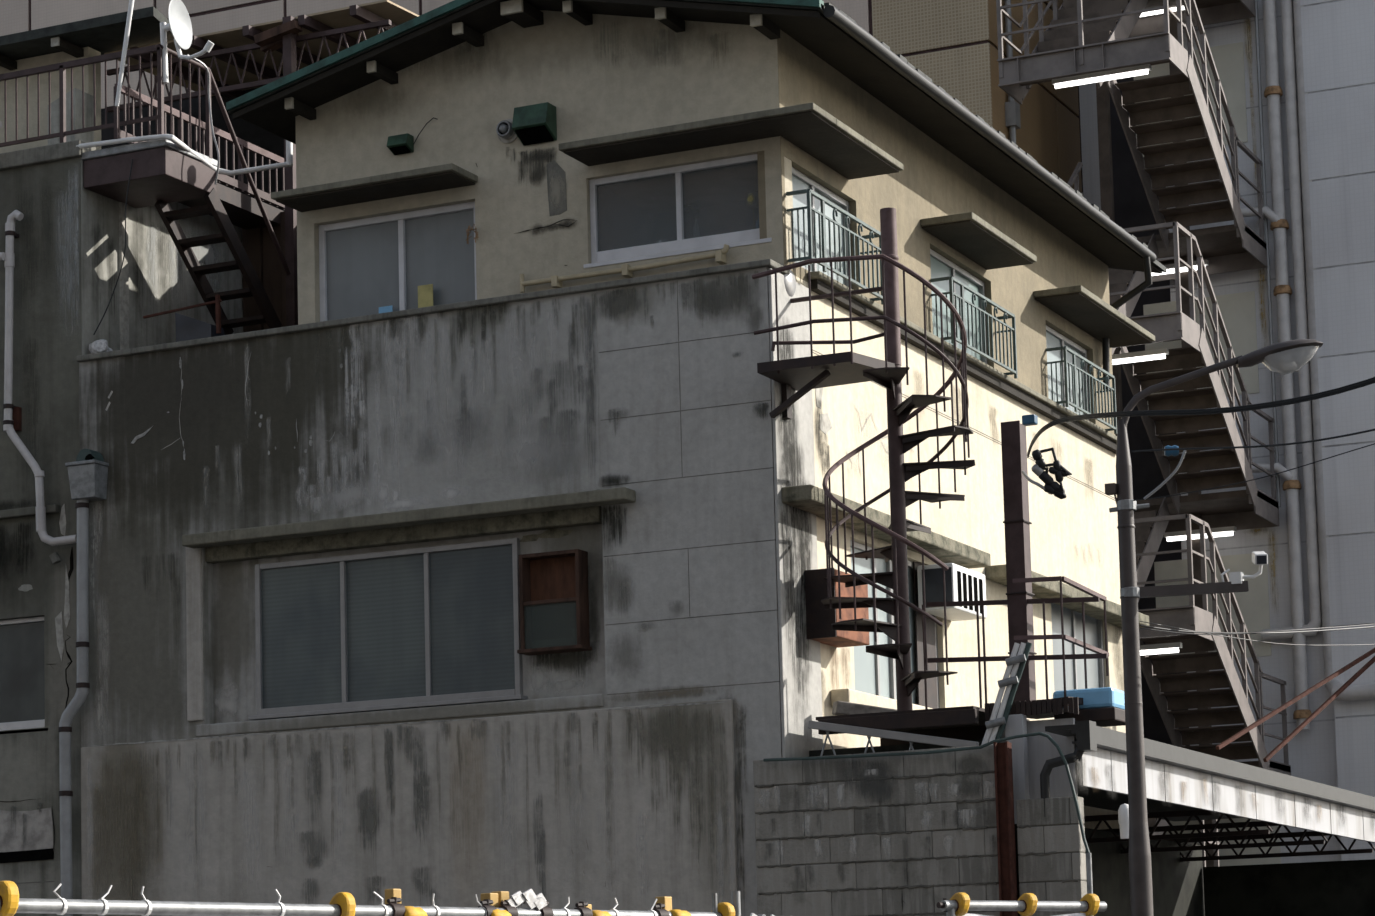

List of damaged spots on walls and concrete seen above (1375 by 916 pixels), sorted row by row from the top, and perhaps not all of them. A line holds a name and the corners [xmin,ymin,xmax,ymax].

leakage [514,150,566,205]
leakage [533,220,574,234]
crack [163,367,184,449]
leakage [328,324,380,435]
leakage [602,476,627,486]
leakage [360,726,428,836]
leakage [628,687,716,841]
flaking render [0,808,54,863]
leakage [534,824,545,897]